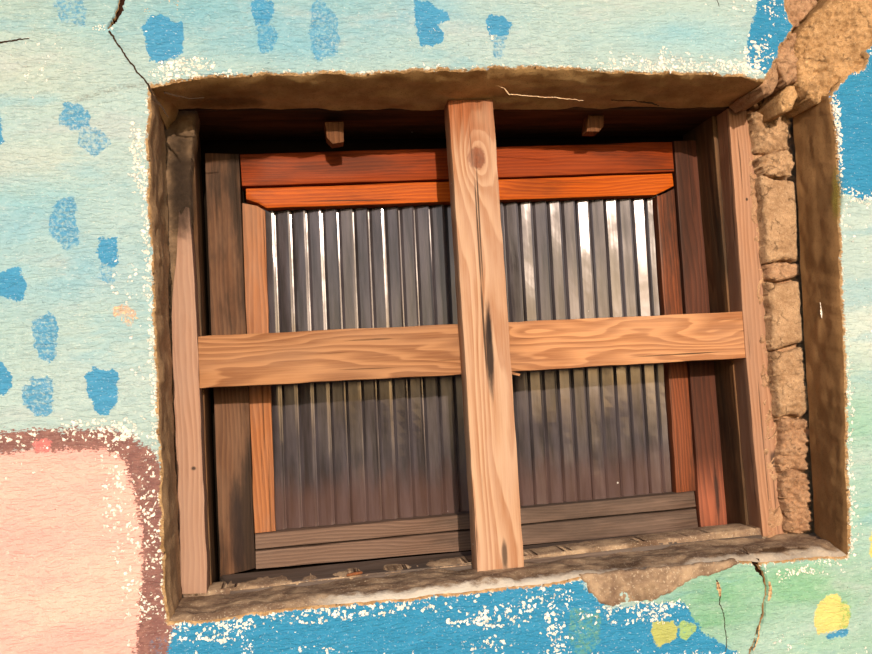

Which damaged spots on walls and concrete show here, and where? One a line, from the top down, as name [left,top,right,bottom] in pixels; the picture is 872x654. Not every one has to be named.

crack [108,0,152,91]
spalling [596,0,872,554]
peeling [579,558,739,624]
crack [716,580,727,652]
crack [743,547,772,601]